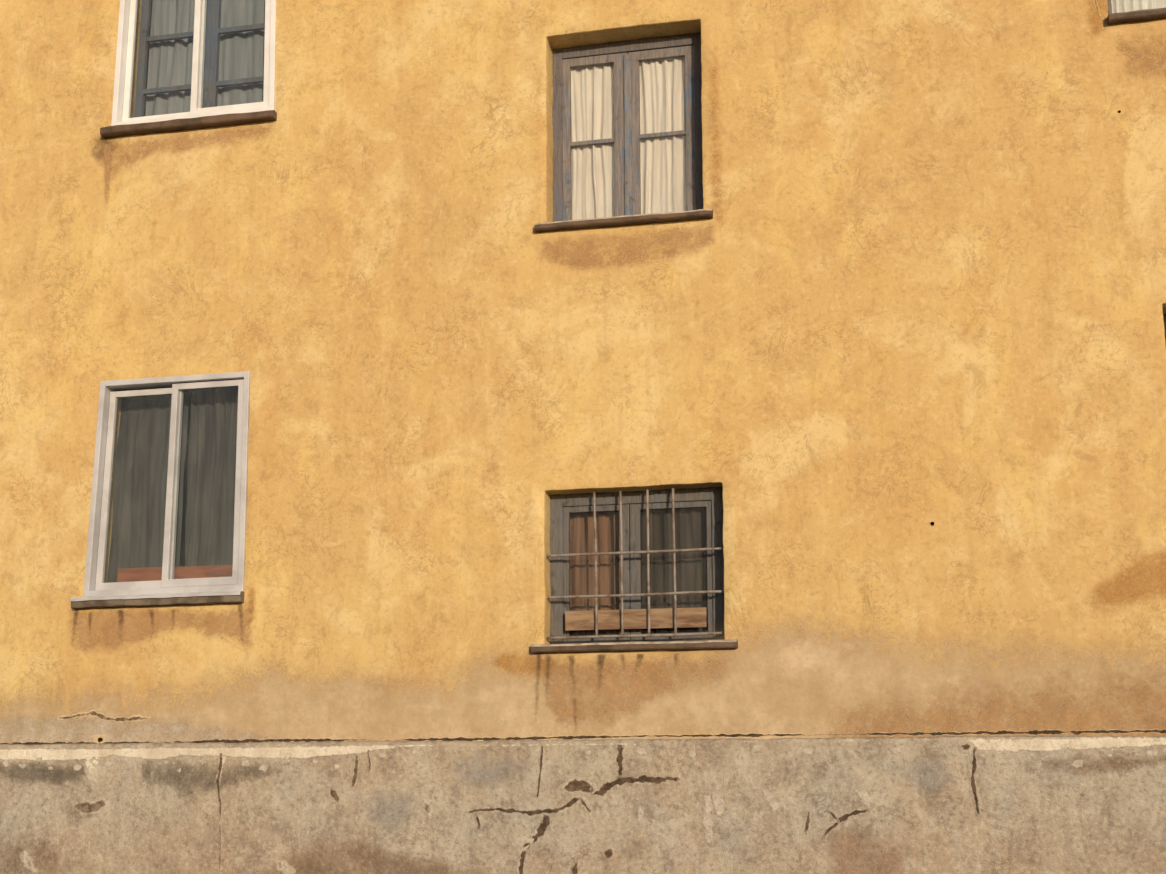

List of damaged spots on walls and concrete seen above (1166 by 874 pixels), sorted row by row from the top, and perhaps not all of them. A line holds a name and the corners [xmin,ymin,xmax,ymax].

water stain [73,603,249,649]
crack [56,710,151,723]
water stain [0,628,1166,743]
crack [467,745,681,874]